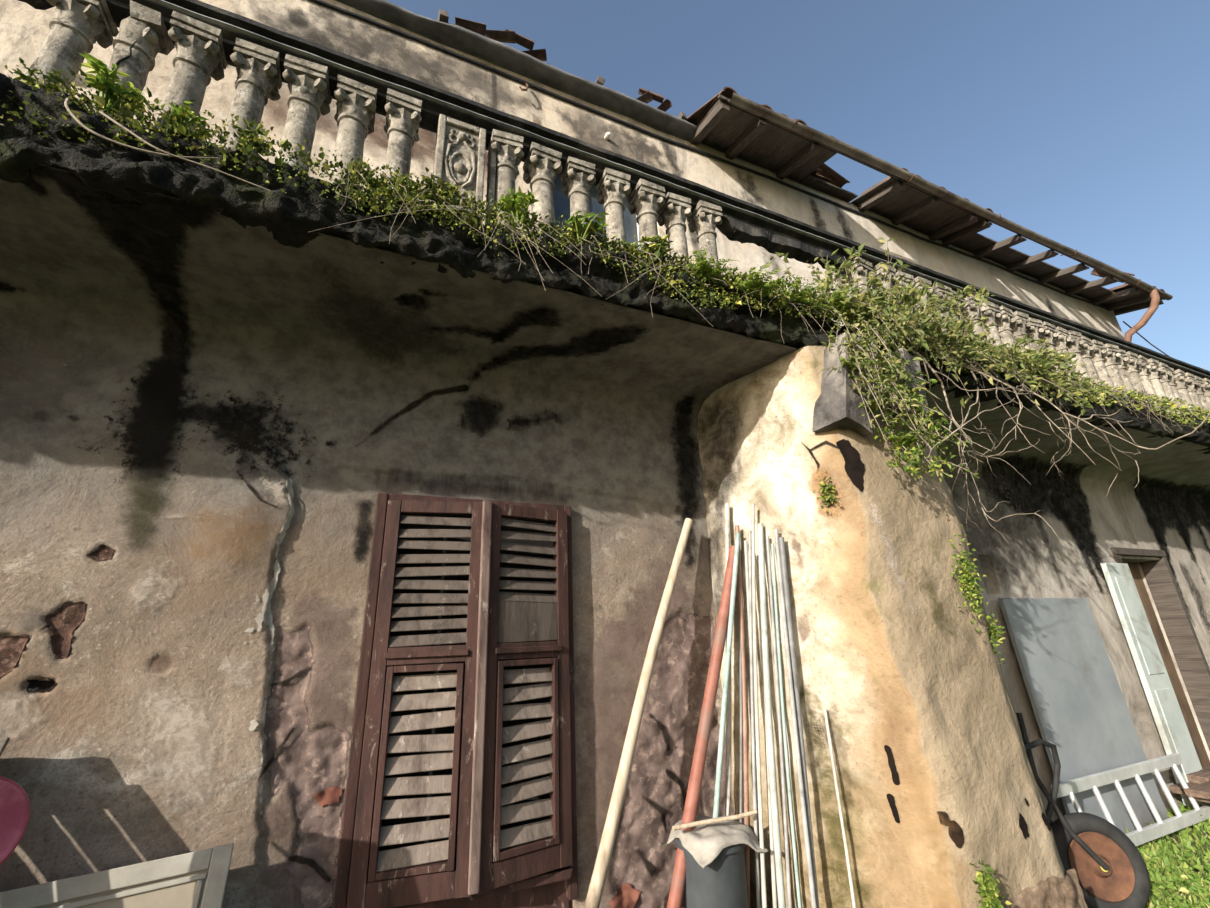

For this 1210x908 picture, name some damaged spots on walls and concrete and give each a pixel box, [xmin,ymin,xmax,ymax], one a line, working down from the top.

damp [256,8,527,111]
damp [810,199,853,241]
damp [20,164,316,546]
spalling [0,601,86,677]
peeling [131,573,169,604]
crack [237,471,295,815]
damp [939,451,1107,592]
damp [1133,475,1210,632]
peeling [138,690,215,810]
peeling [255,593,356,908]
peeling [578,567,735,908]